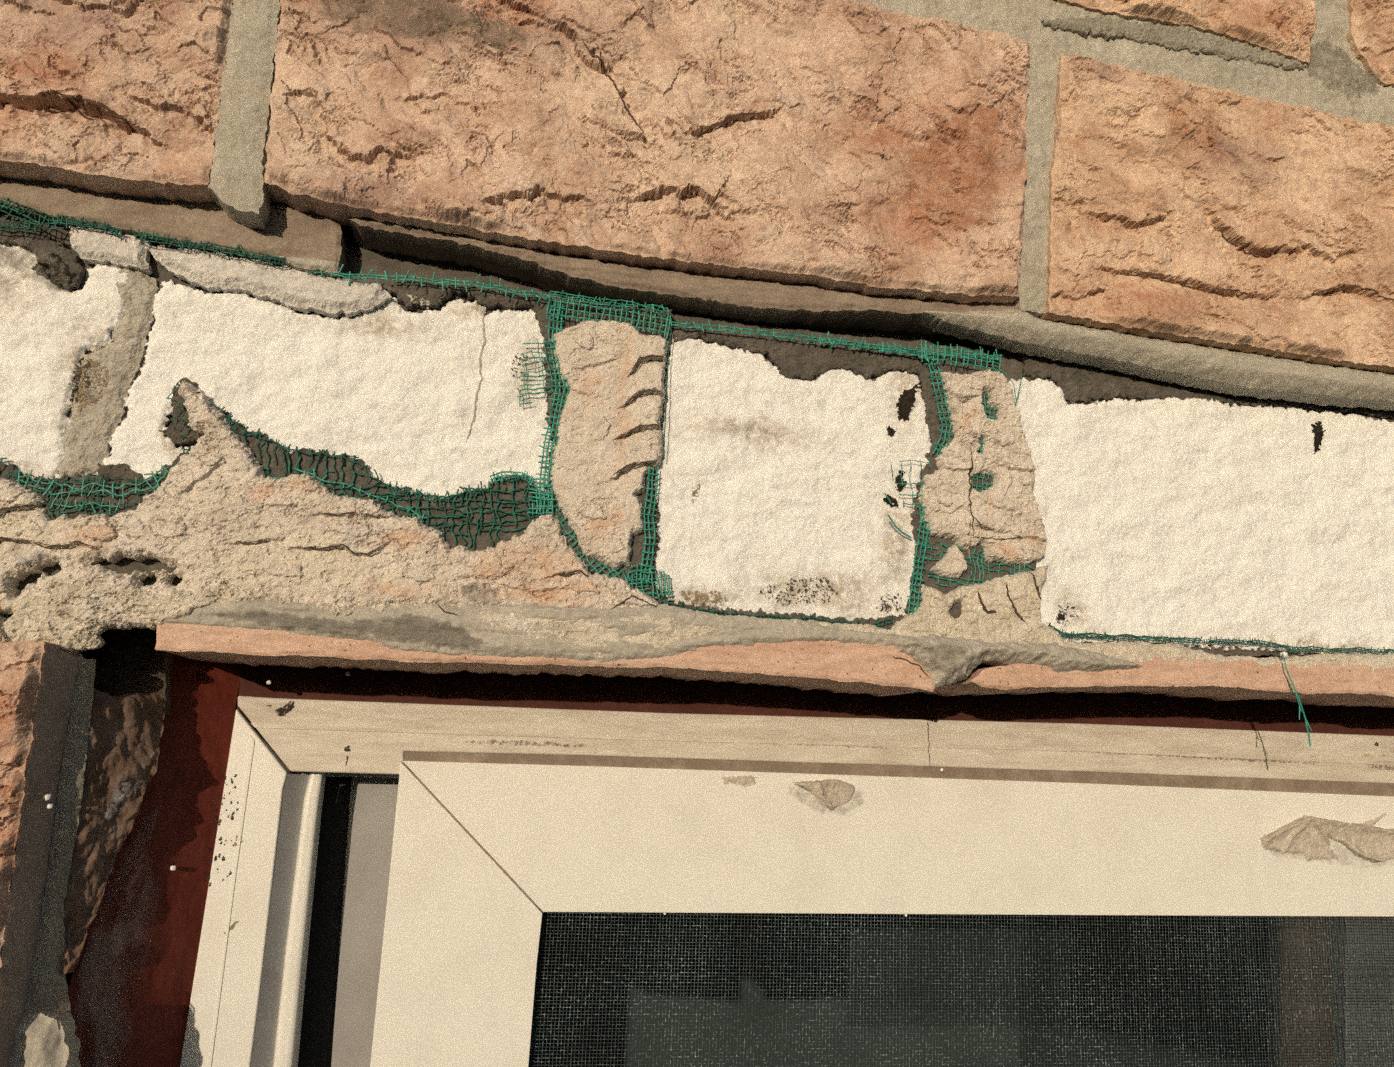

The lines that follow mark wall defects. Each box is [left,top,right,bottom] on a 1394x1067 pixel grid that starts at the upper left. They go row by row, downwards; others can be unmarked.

spalling [0,198,286,292]
crack [466,311,486,443]
spalling [0,264,1394,716]